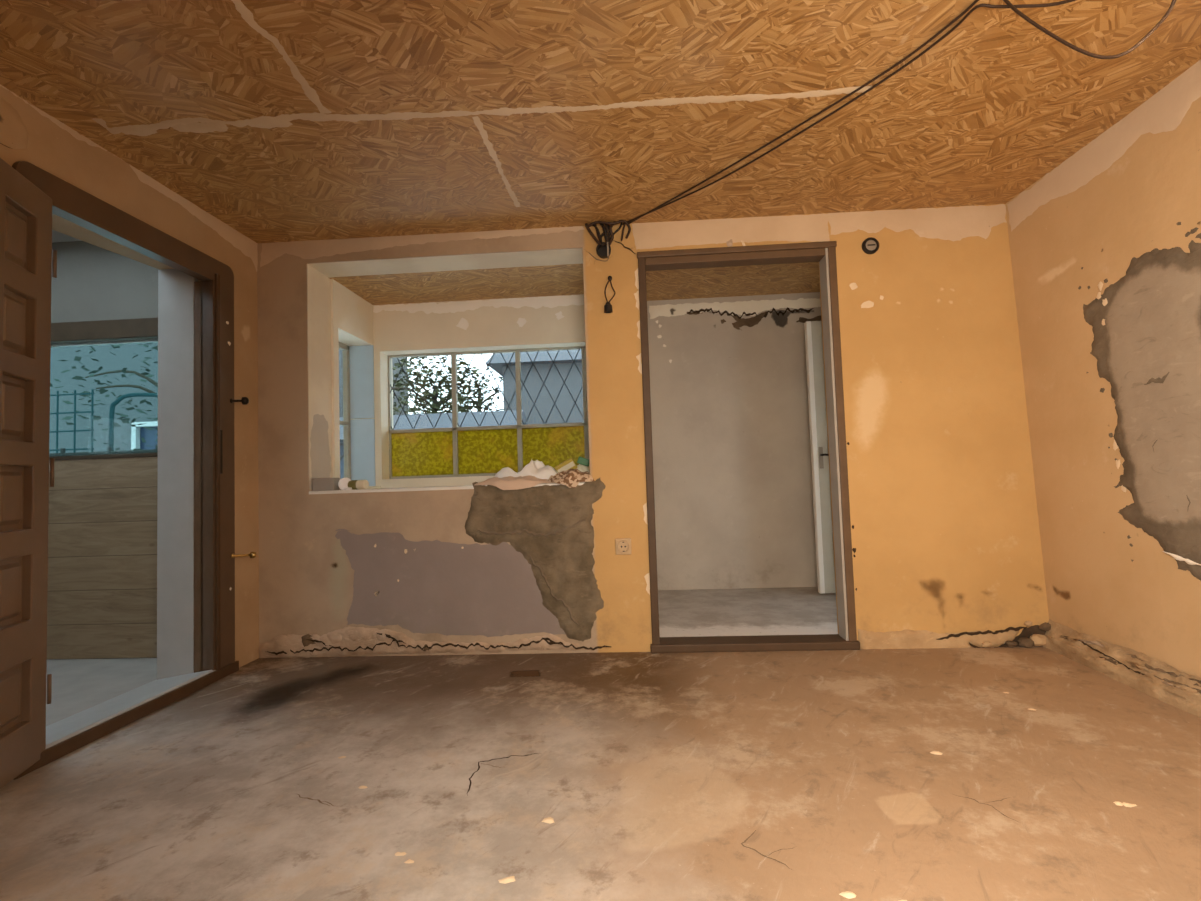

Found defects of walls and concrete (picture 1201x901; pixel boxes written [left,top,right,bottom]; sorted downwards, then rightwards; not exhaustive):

peeling [634,268,822,374]
peeling [1078,279,1108,326]
peeling [259,529,611,658]
leakage [248,669,362,710]
crack [467,753,537,796]